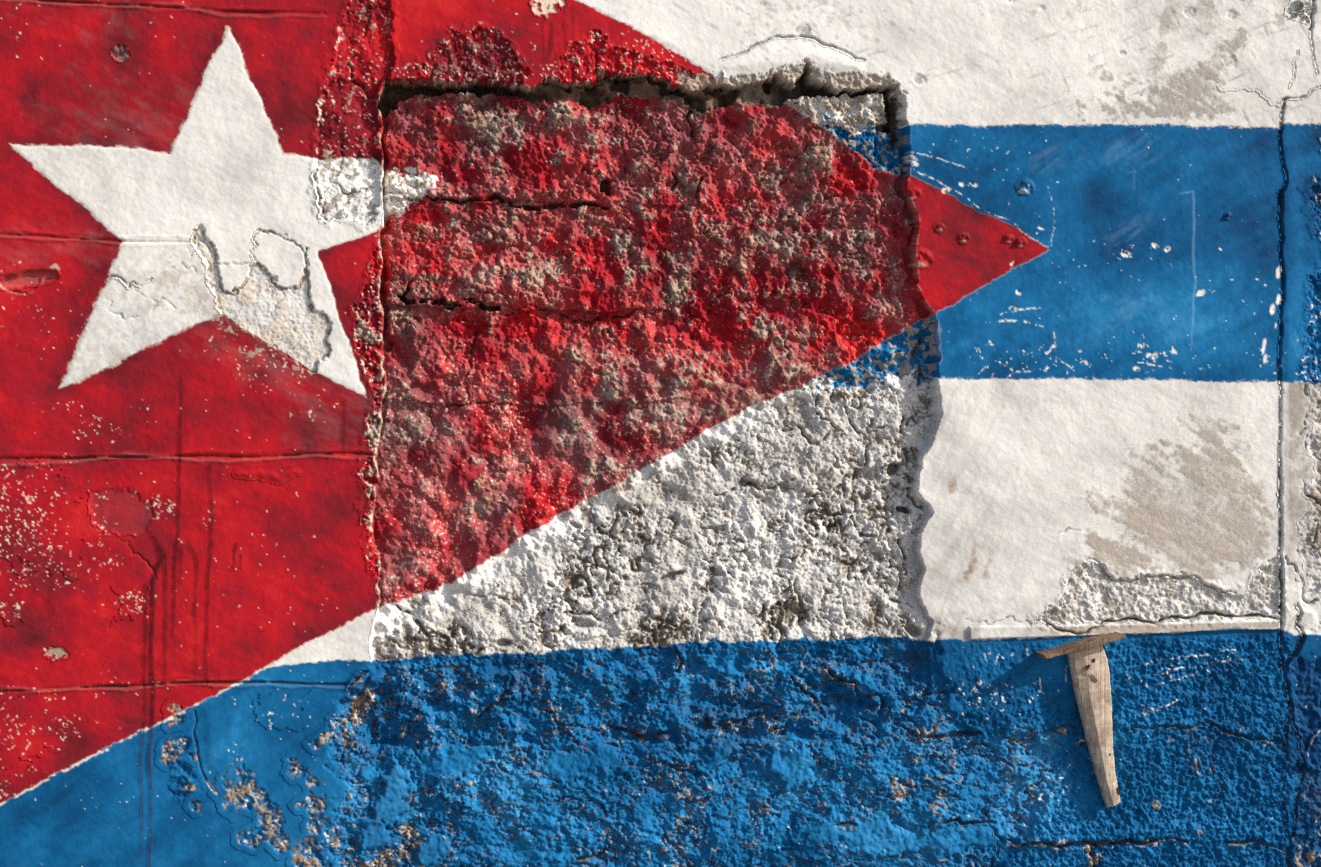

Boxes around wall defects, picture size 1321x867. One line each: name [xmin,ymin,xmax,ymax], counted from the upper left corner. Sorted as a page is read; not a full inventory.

spalling [312,0,910,227]
spalling [1303,181,1321,239]
spalling [1035,413,1280,627]
crack [1124,0,1321,867]
spalling [1296,267,1321,594]
spalling [155,644,1088,867]